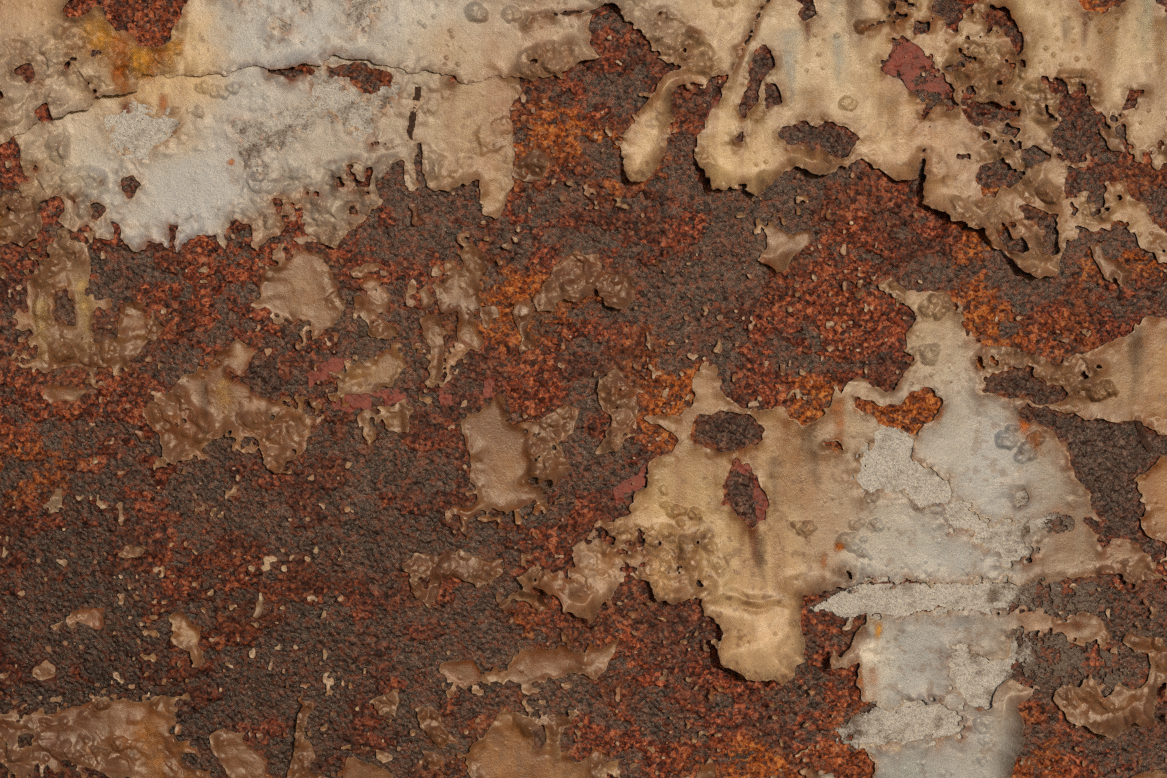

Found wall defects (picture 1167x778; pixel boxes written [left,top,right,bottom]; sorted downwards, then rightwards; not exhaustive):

rust [505,104,621,222]
rust [0,366,178,508]
rust [129,229,312,367]
rust [100,525,364,655]
peeling [402,550,503,608]
peeling [445,394,578,534]
peeling [0,0,1167,480]
rust [627,348,700,417]
peeling [498,277,1167,778]
rust [727,198,941,457]
peeling [0,684,327,778]
peeling [341,745,393,778]